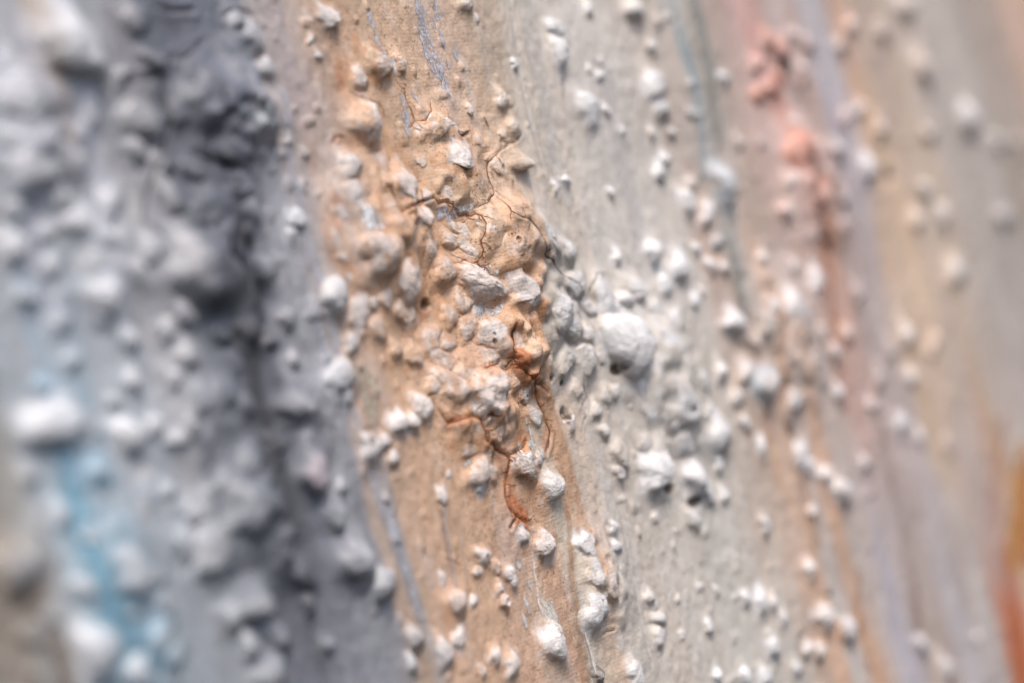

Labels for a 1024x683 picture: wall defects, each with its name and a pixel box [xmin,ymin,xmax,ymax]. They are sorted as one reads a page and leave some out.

crack [380,117,606,301]
crack [434,323,555,527]